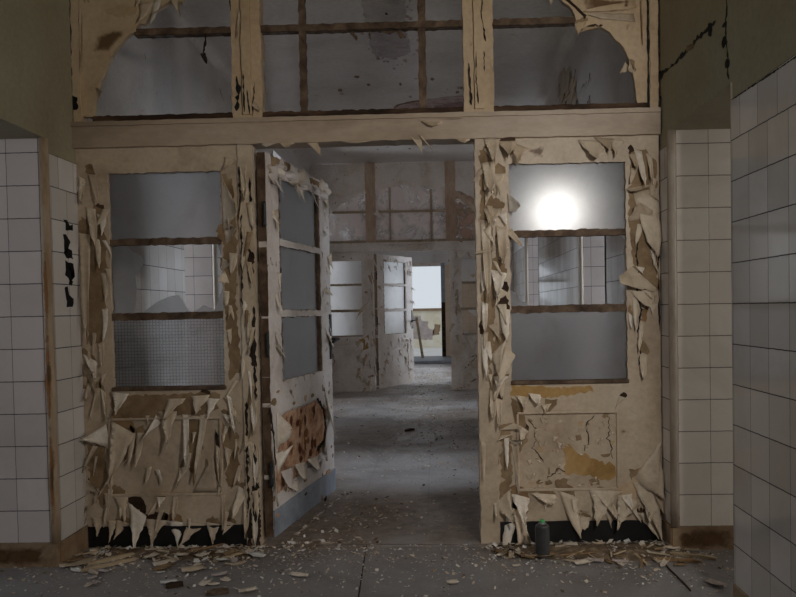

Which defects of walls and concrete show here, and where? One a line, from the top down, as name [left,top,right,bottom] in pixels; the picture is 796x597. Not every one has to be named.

peeling [98,32,121,57]
flaking render [360,0,419,70]
peeling [566,0,644,45]
peeling [620,59,636,73]
crack [646,0,796,108]
peeling [261,143,333,236]
peeling [59,157,266,587]
peeling [356,137,704,567]
peeling [269,384,337,517]
peeling [280,491,389,558]